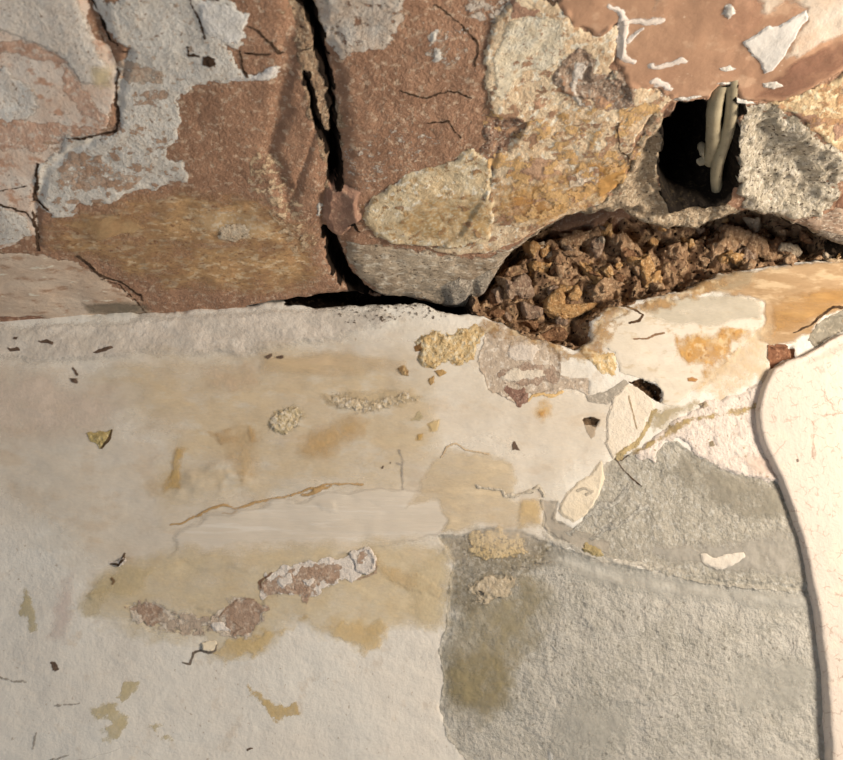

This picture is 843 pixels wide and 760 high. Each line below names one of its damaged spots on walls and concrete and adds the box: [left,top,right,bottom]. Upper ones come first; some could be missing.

peeling [196,0,249,45]
crack [433,4,479,67]
peeling [721,4,735,19]
peeling [227,65,281,82]
crack [400,90,472,99]
crack [284,223,499,316]
spalling [414,98,843,407]
crack [793,305,843,333]
crack [170,483,363,526]
leakage [0,348,602,656]
peeling [124,546,377,665]
spalling [438,441,825,760]